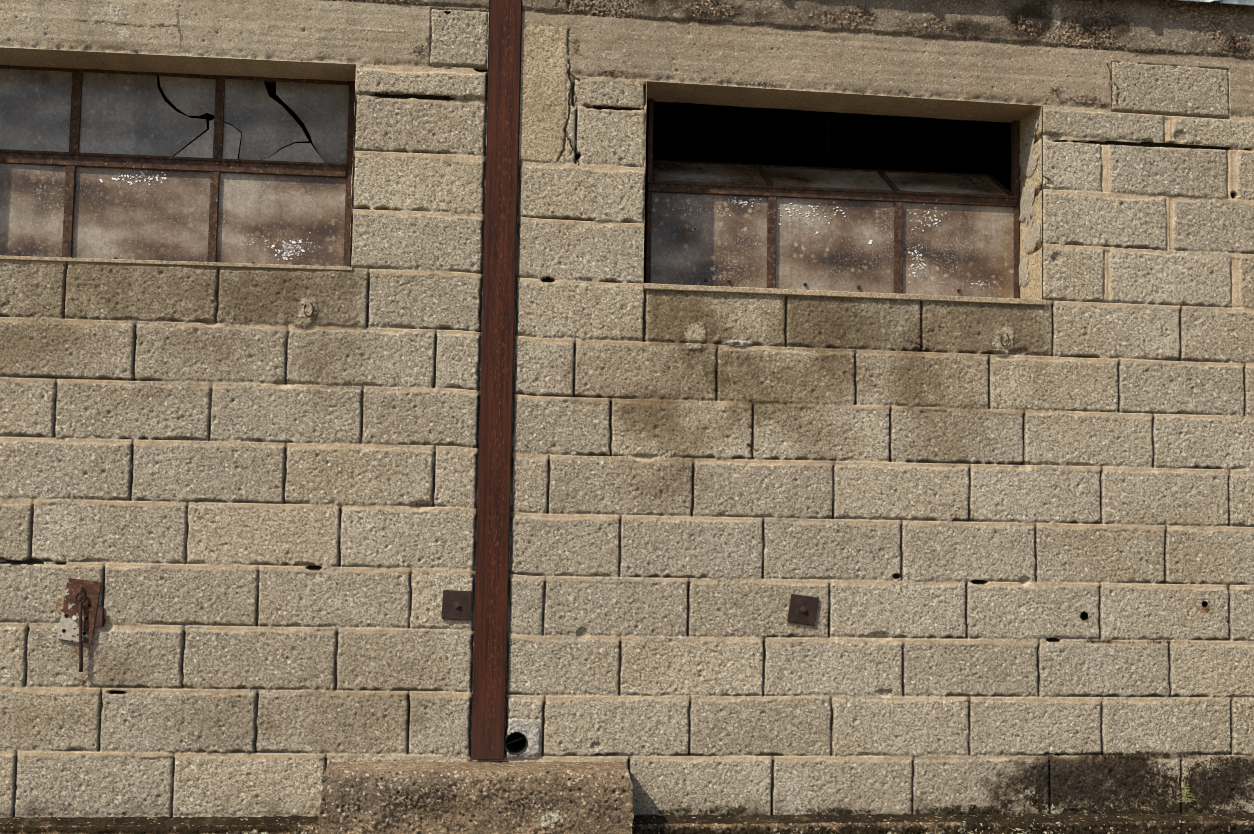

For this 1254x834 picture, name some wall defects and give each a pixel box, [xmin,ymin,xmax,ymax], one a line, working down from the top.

crack [555,0,580,166]
water stain [650,806,758,816]
water stain [795,807,874,816]
water stain [912,751,1254,815]